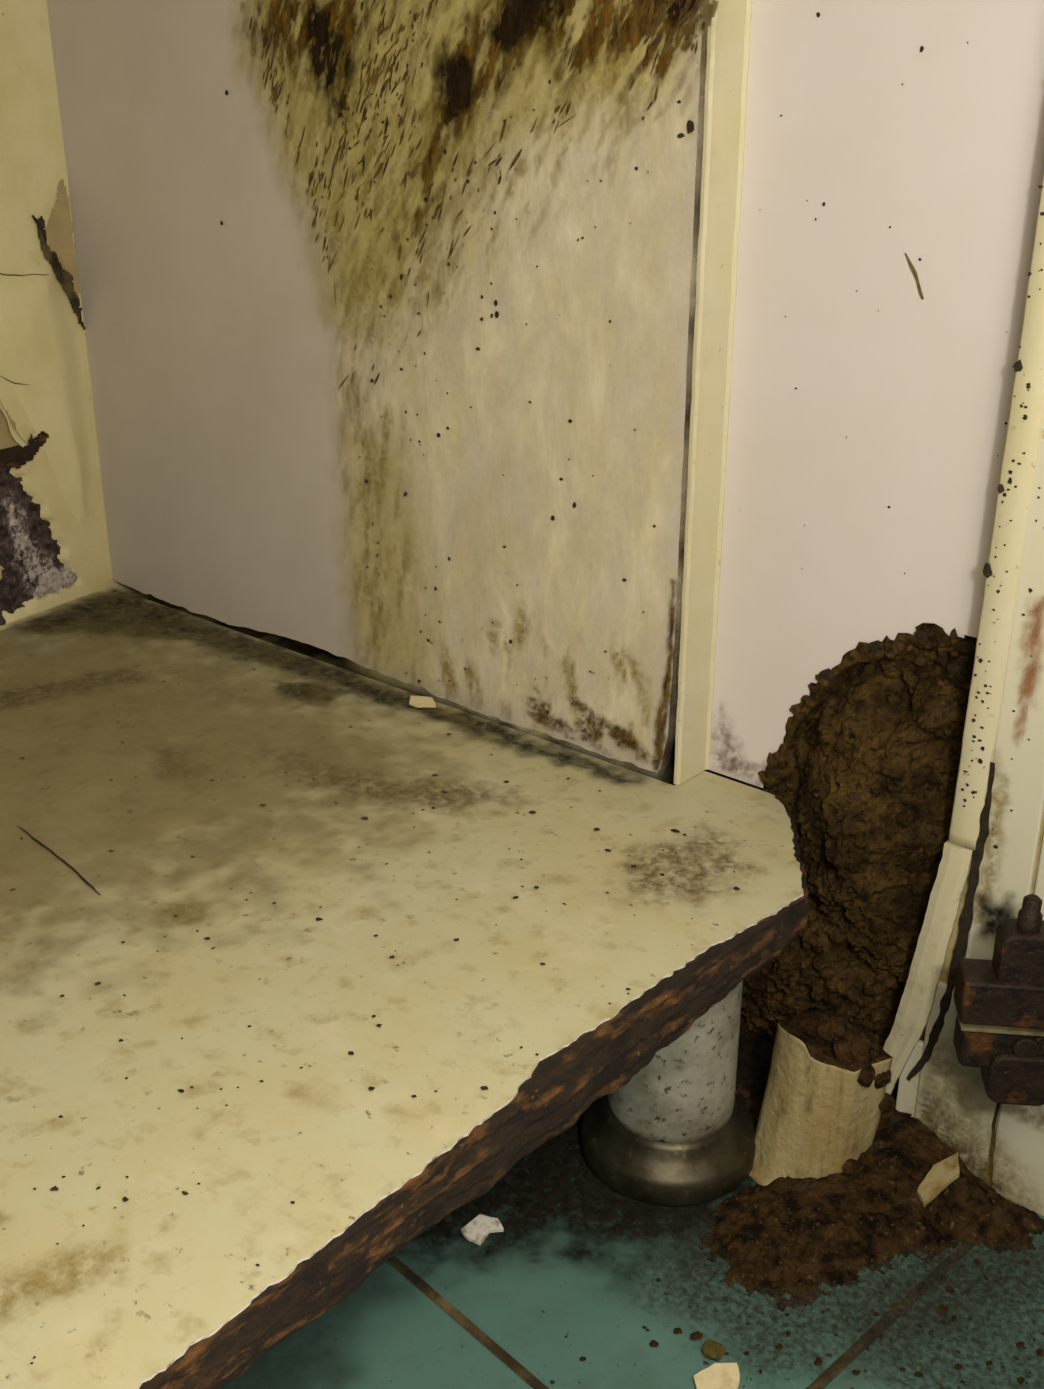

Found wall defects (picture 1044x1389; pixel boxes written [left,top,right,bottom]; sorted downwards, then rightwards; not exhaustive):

leakage [245,0,703,759]
flaking render [0,399,77,626]
rust [1018,607,1040,735]